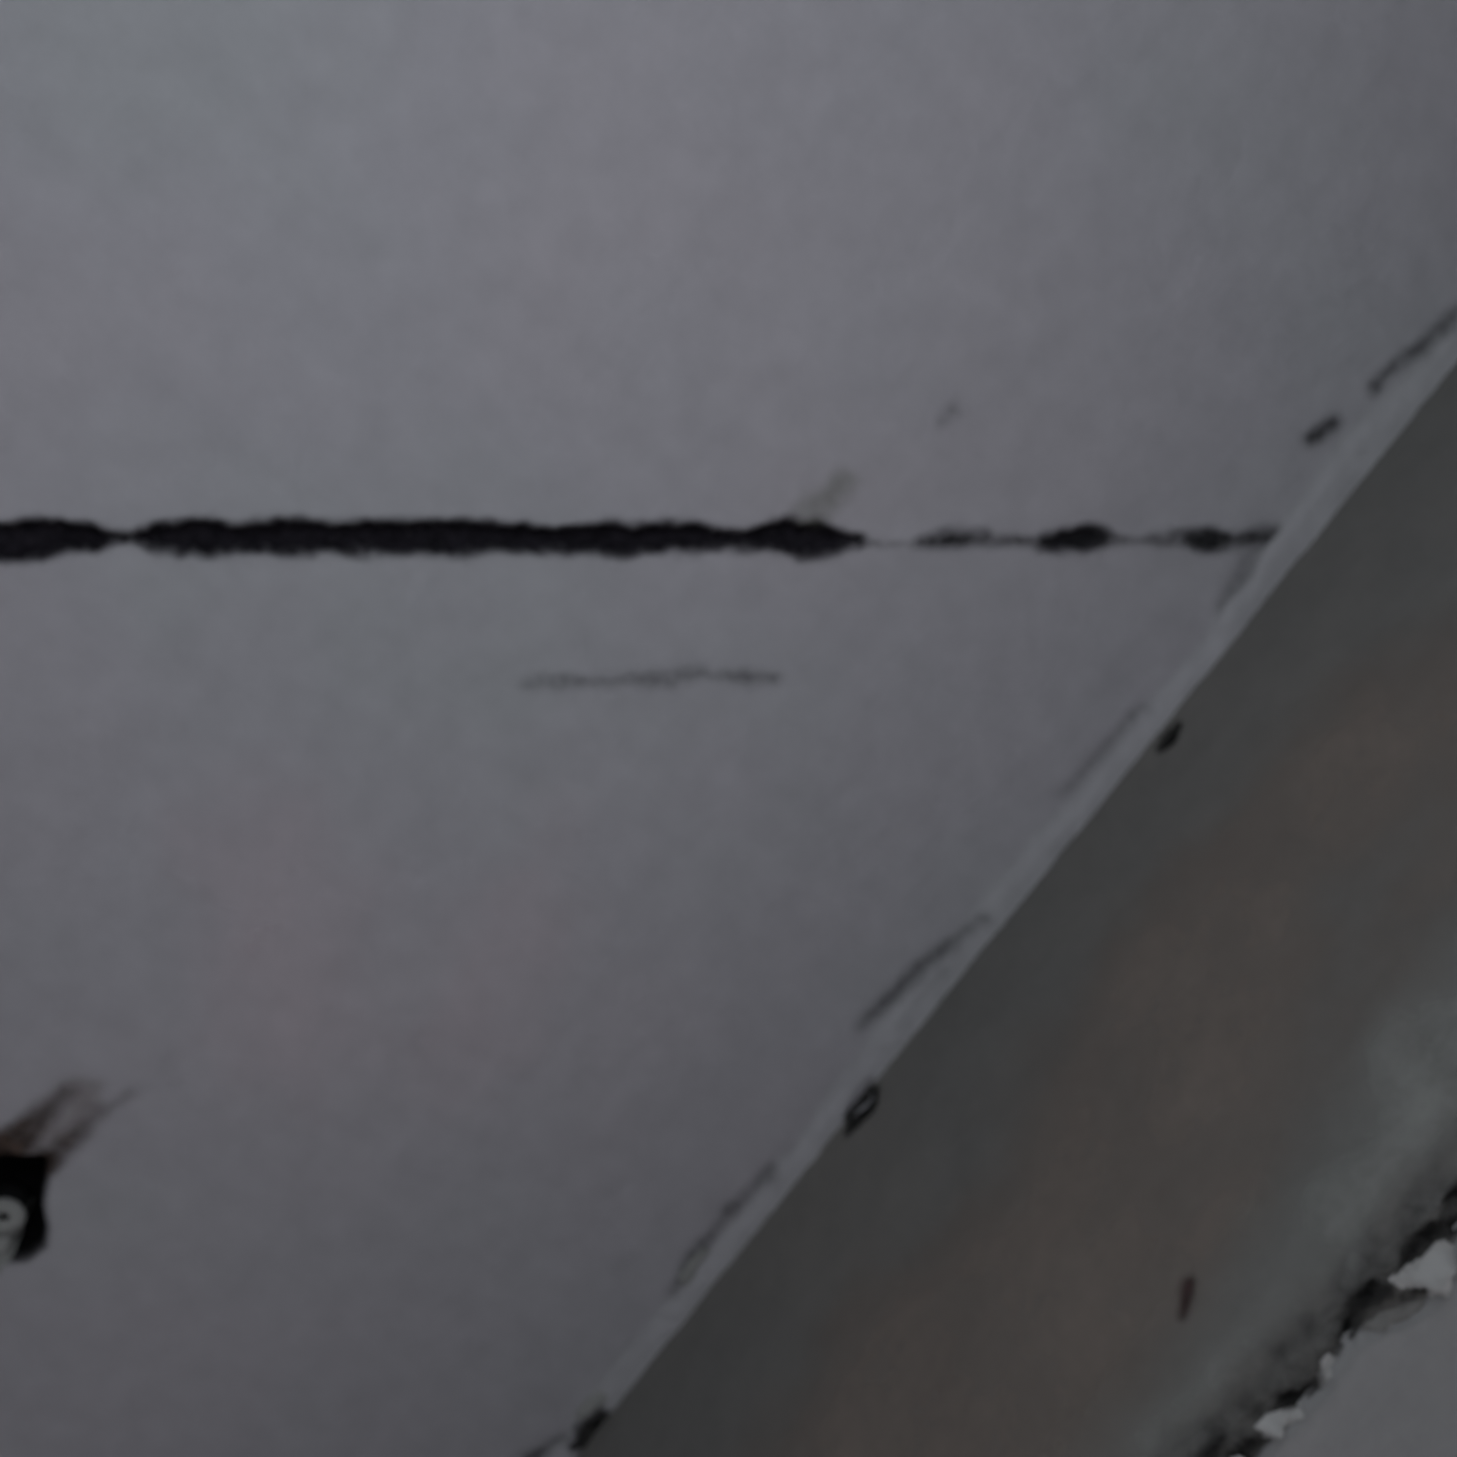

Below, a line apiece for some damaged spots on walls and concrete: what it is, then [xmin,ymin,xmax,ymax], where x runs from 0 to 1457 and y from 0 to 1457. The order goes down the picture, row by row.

crack [0,518,864,562]
crack [920,533,988,545]
crack [1040,525,1115,552]
crack [1156,529,1255,552]
spalling [1159,1176,1457,1457]